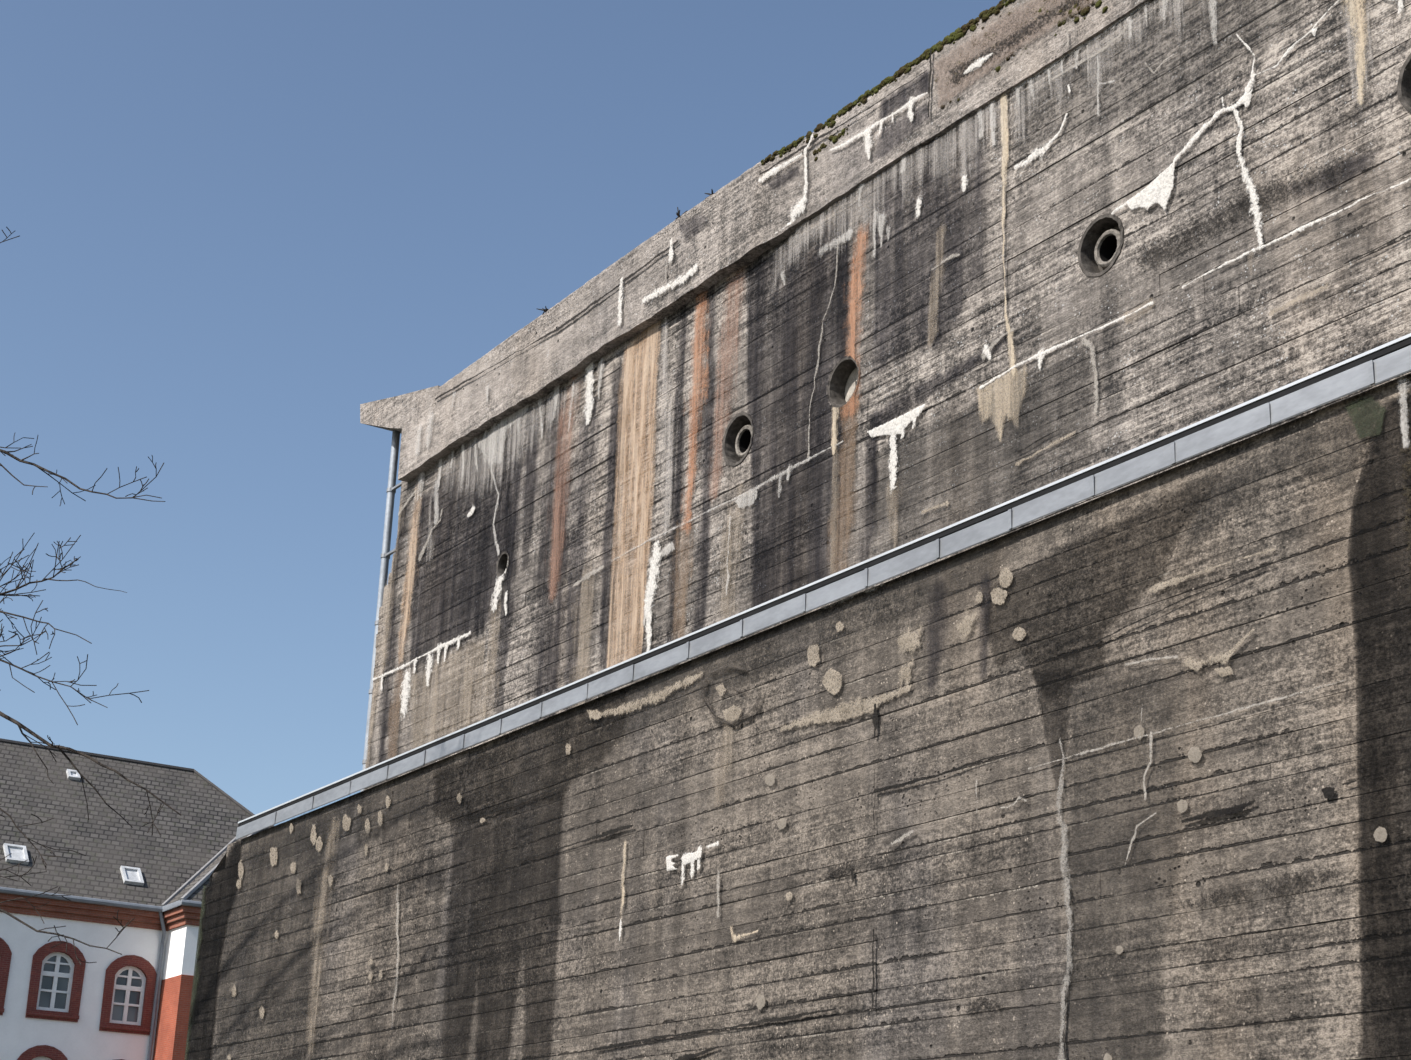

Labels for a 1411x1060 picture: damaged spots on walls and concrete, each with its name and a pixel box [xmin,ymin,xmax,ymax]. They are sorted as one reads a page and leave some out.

leakage [373,357,622,763]
corrosion [607,320,661,668]
corrosion [674,267,743,638]
leakage [637,182,888,651]
corrosion [831,387,859,571]
corrosion [848,226,868,362]
crack [869,929,877,1009]
leakage [867,402,925,493]
leakage [977,302,1153,441]
crack [872,680,1343,1060]
crack [1173,0,1339,246]
leakage [1348,375,1411,1060]